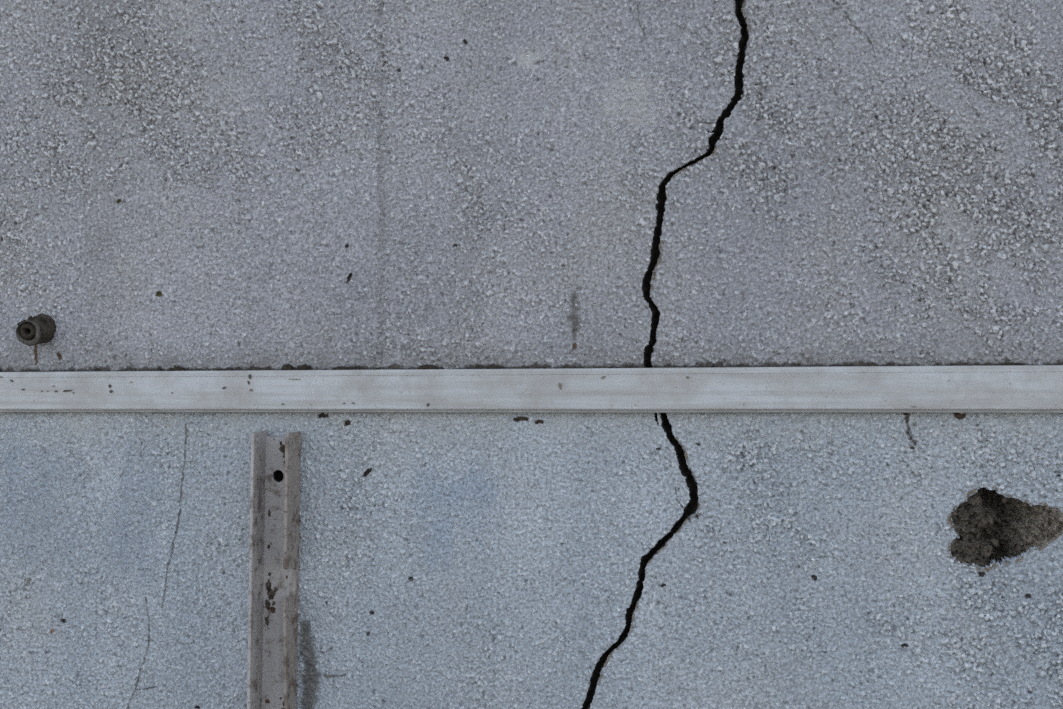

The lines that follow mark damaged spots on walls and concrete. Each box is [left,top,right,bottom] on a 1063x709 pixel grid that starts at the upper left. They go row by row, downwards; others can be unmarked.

crack [642,0,750,368]
crack [581,413,700,709]
spalling [947,486,1063,577]